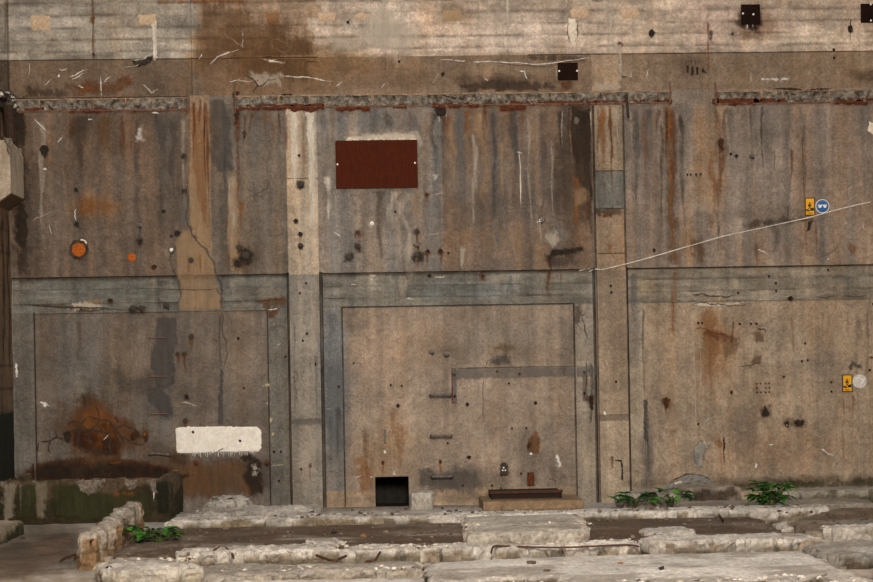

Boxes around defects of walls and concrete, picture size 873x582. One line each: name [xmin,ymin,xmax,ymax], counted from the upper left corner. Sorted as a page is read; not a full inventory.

rust [431,99,676,162]
leakage [558,108,593,220]
crack [163,288,223,304]
crack [258,296,286,318]
rust [61,397,148,464]